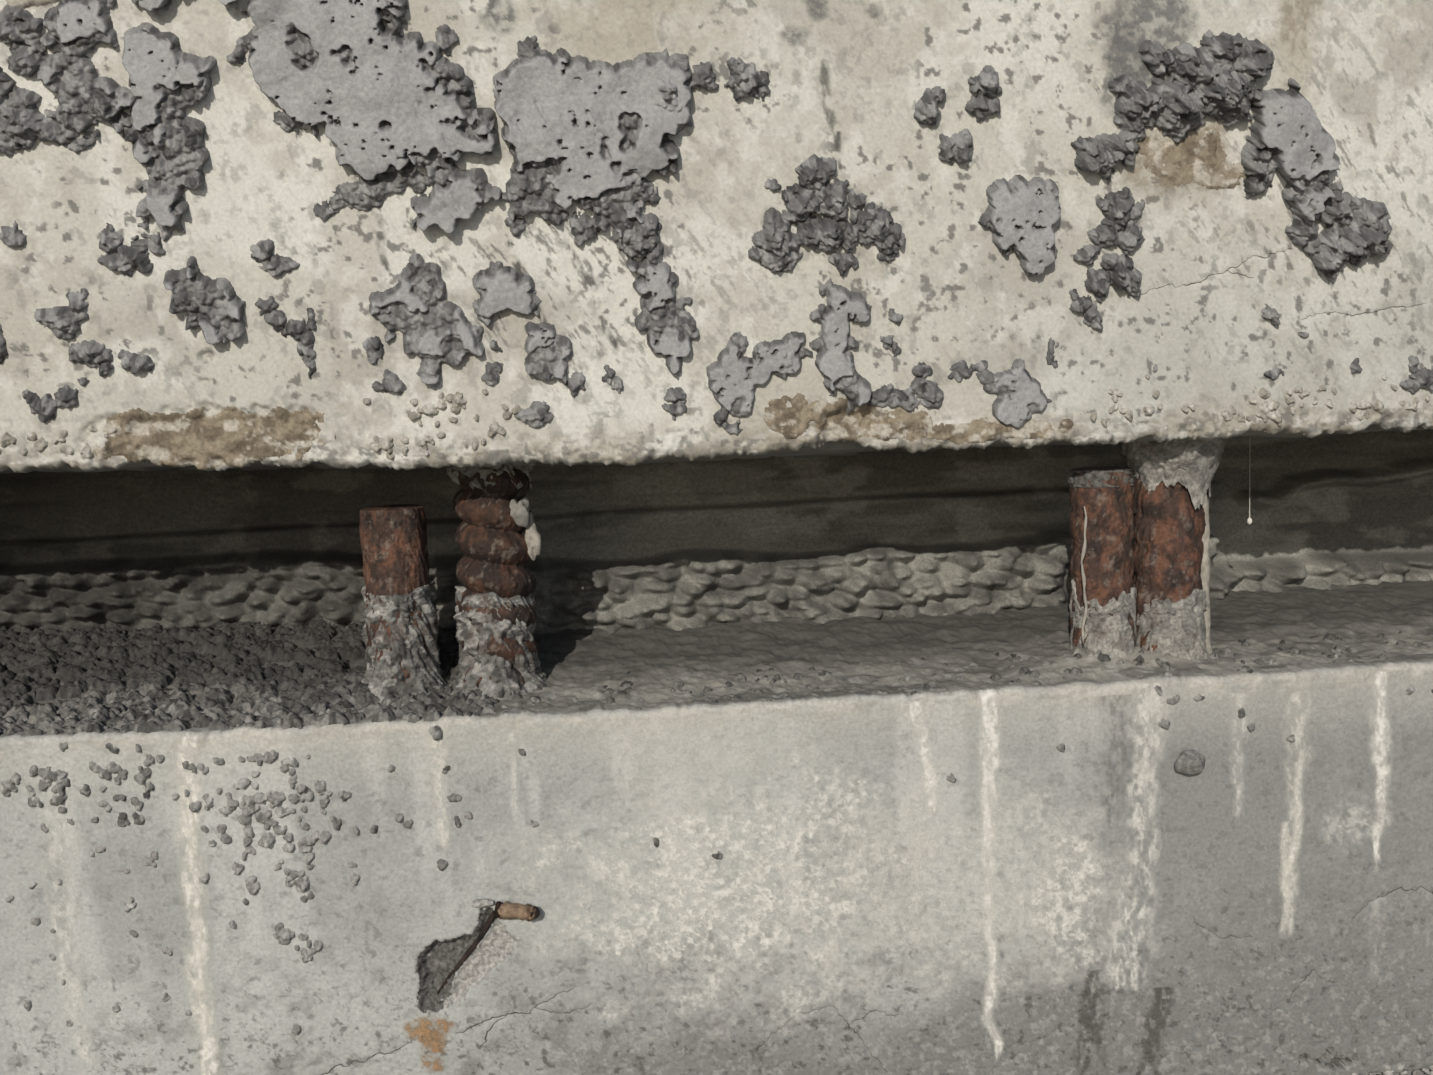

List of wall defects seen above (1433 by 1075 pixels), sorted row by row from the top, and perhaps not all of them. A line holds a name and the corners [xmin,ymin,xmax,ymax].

peeling [227,0,503,234]
peeling [362,254,624,397]
peeling [706,154,1073,445]
crack [1127,248,1288,298]
peeling [1069,29,1393,332]
spalling [92,405,327,471]
damp [522,683,1164,1072]
efflorescence [1280,673,1310,932]
efflorescence [1329,672,1390,859]
corrosion [405,1018,453,1071]
crack [457,989,590,1047]
damp [1142,987,1171,1075]